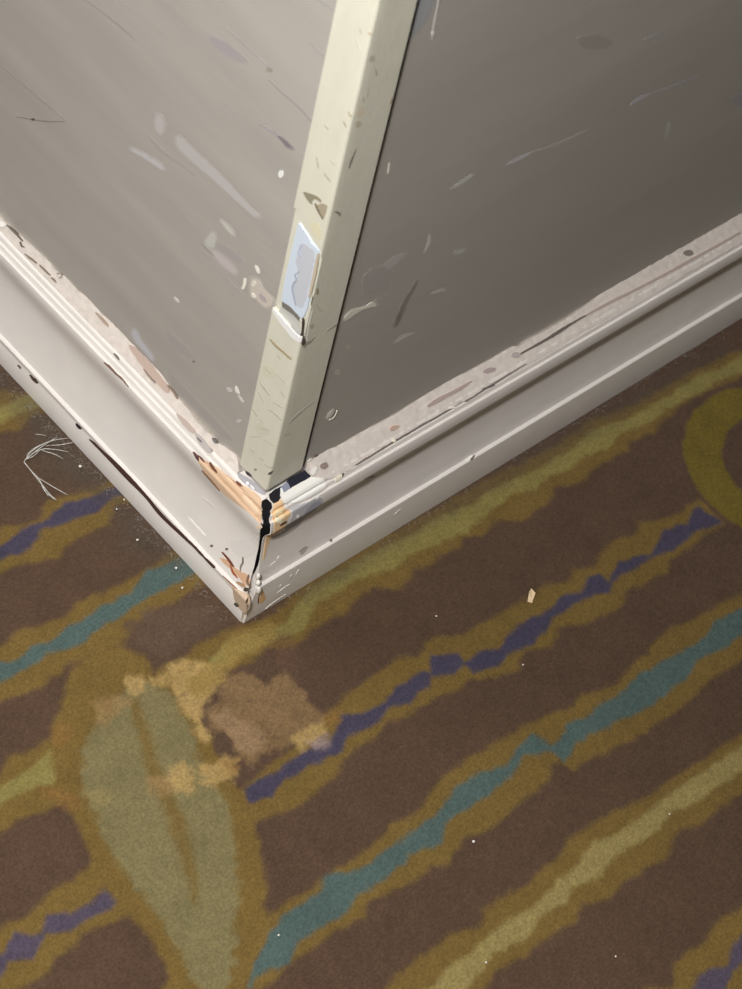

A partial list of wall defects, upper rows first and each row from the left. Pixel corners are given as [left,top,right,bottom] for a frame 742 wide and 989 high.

crack [76,423,272,615]
peeling [238,471,267,529]
peeling [280,458,342,505]